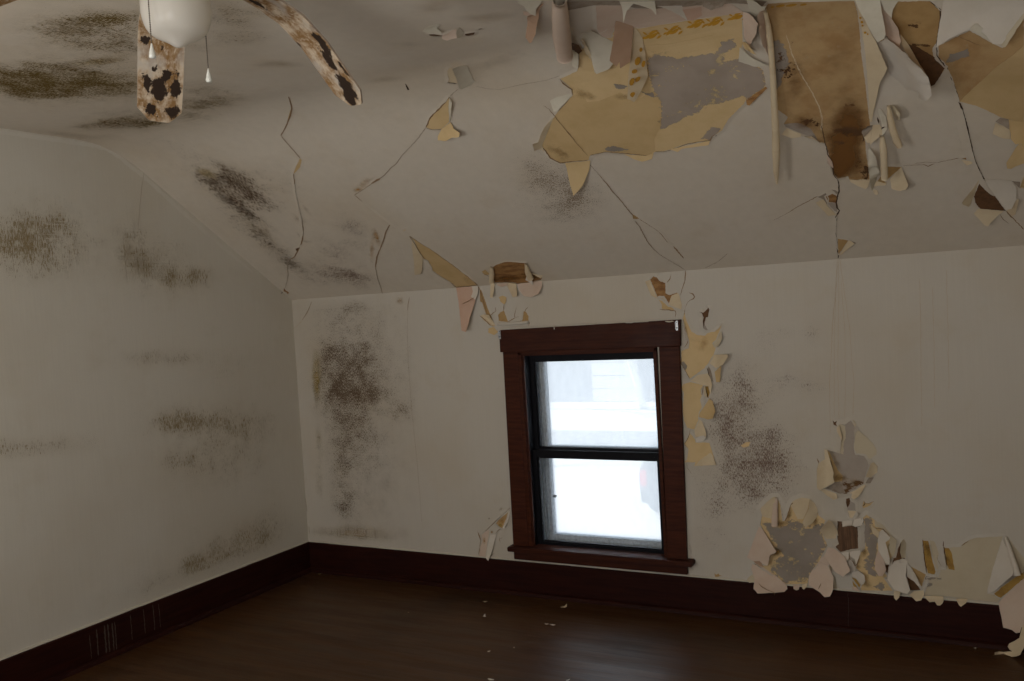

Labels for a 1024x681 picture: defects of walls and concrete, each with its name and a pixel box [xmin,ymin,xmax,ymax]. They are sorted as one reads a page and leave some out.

flaking render [563,0,767,10]
leakage [0,6,171,129]
leakage [0,205,220,295]
crack [281,97,305,294]
crack [545,106,727,345]
leakage [801,102,869,179]
leakage [181,146,414,521]
leakage [699,363,816,546]
flaking render [826,421,869,511]